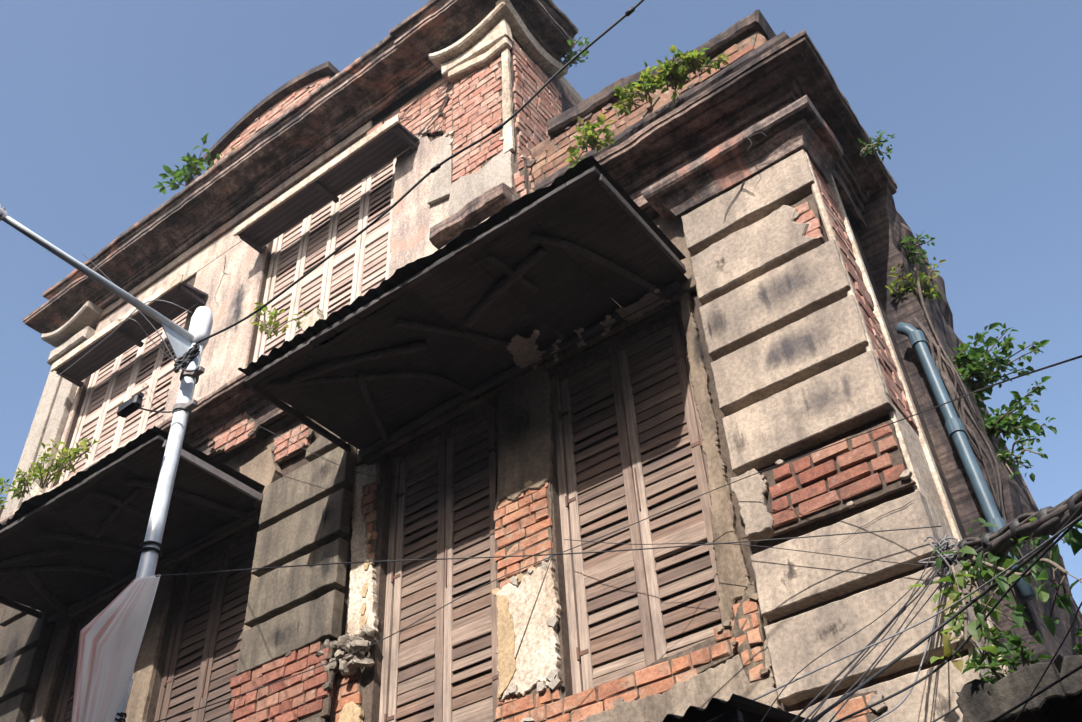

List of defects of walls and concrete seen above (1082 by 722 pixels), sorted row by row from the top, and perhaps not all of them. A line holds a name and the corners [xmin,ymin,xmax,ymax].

crack [723,179,753,222]
peeling [507,330,561,370]
damp [776,336,812,360]
flaking render [760,160,918,536]
peeling [347,463,380,636]
peeling [491,480,770,722]
flaking render [225,641,362,722]
flaking render [835,690,887,722]